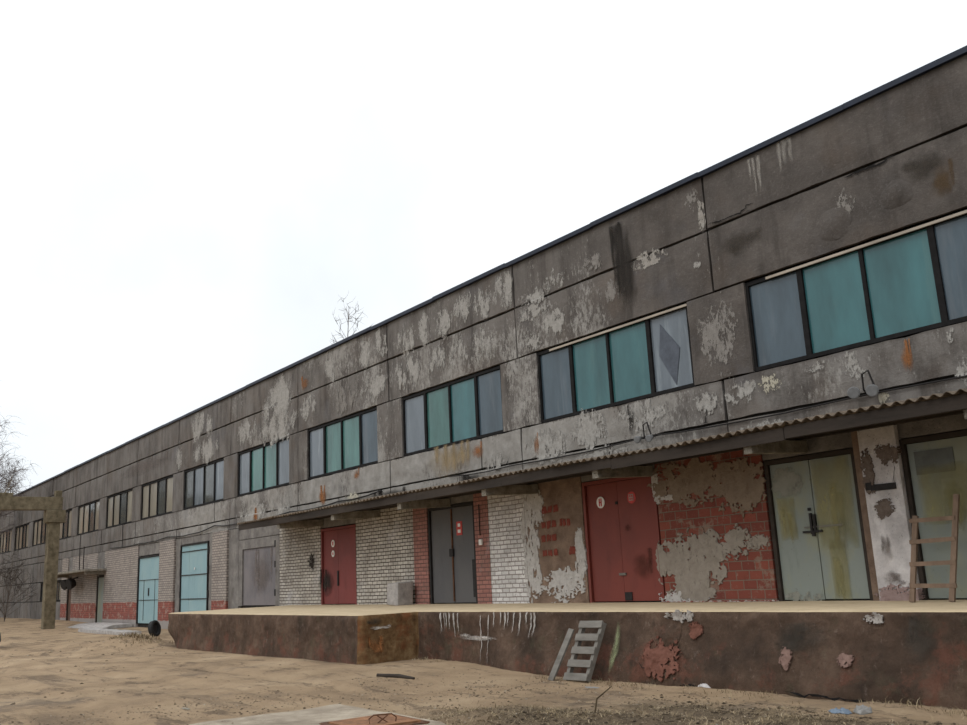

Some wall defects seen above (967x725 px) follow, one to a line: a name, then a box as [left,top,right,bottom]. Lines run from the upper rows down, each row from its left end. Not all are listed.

leakage [609,222,633,297]
peeling [693,291,782,415]
peeling [235,372,316,447]
flaking render [860,443,902,520]
flaking render [521,490,588,603]
flaking render [647,457,803,640]
leakage [439,612,535,651]
flaking render [642,636,683,682]
flaking render [778,646,793,671]
flaking render [836,653,854,668]